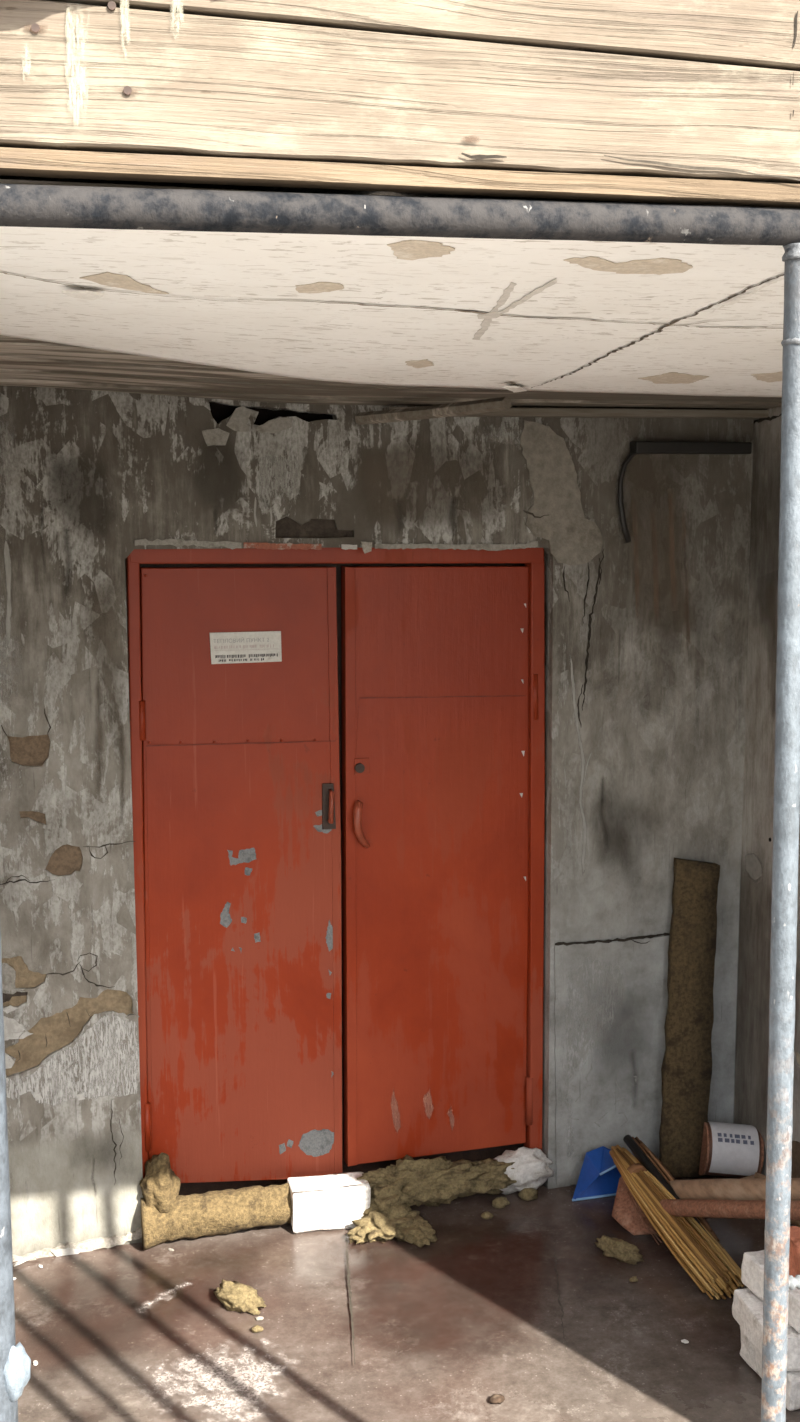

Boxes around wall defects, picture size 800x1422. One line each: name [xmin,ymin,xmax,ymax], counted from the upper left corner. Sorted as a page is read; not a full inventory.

crack [0,272,784,393]
spalling [202,400,338,446]
crack [563,550,604,725]
spalling [1,709,52,770]
spalling [44,840,135,878]
peeling [227,848,256,876]
peeling [220,902,261,952]
peeling [325,920,333,951]
crack [555,933,670,946]
peeling [1,956,139,1106]
peeling [279,1129,334,1157]
damp [147,1341,288,1422]